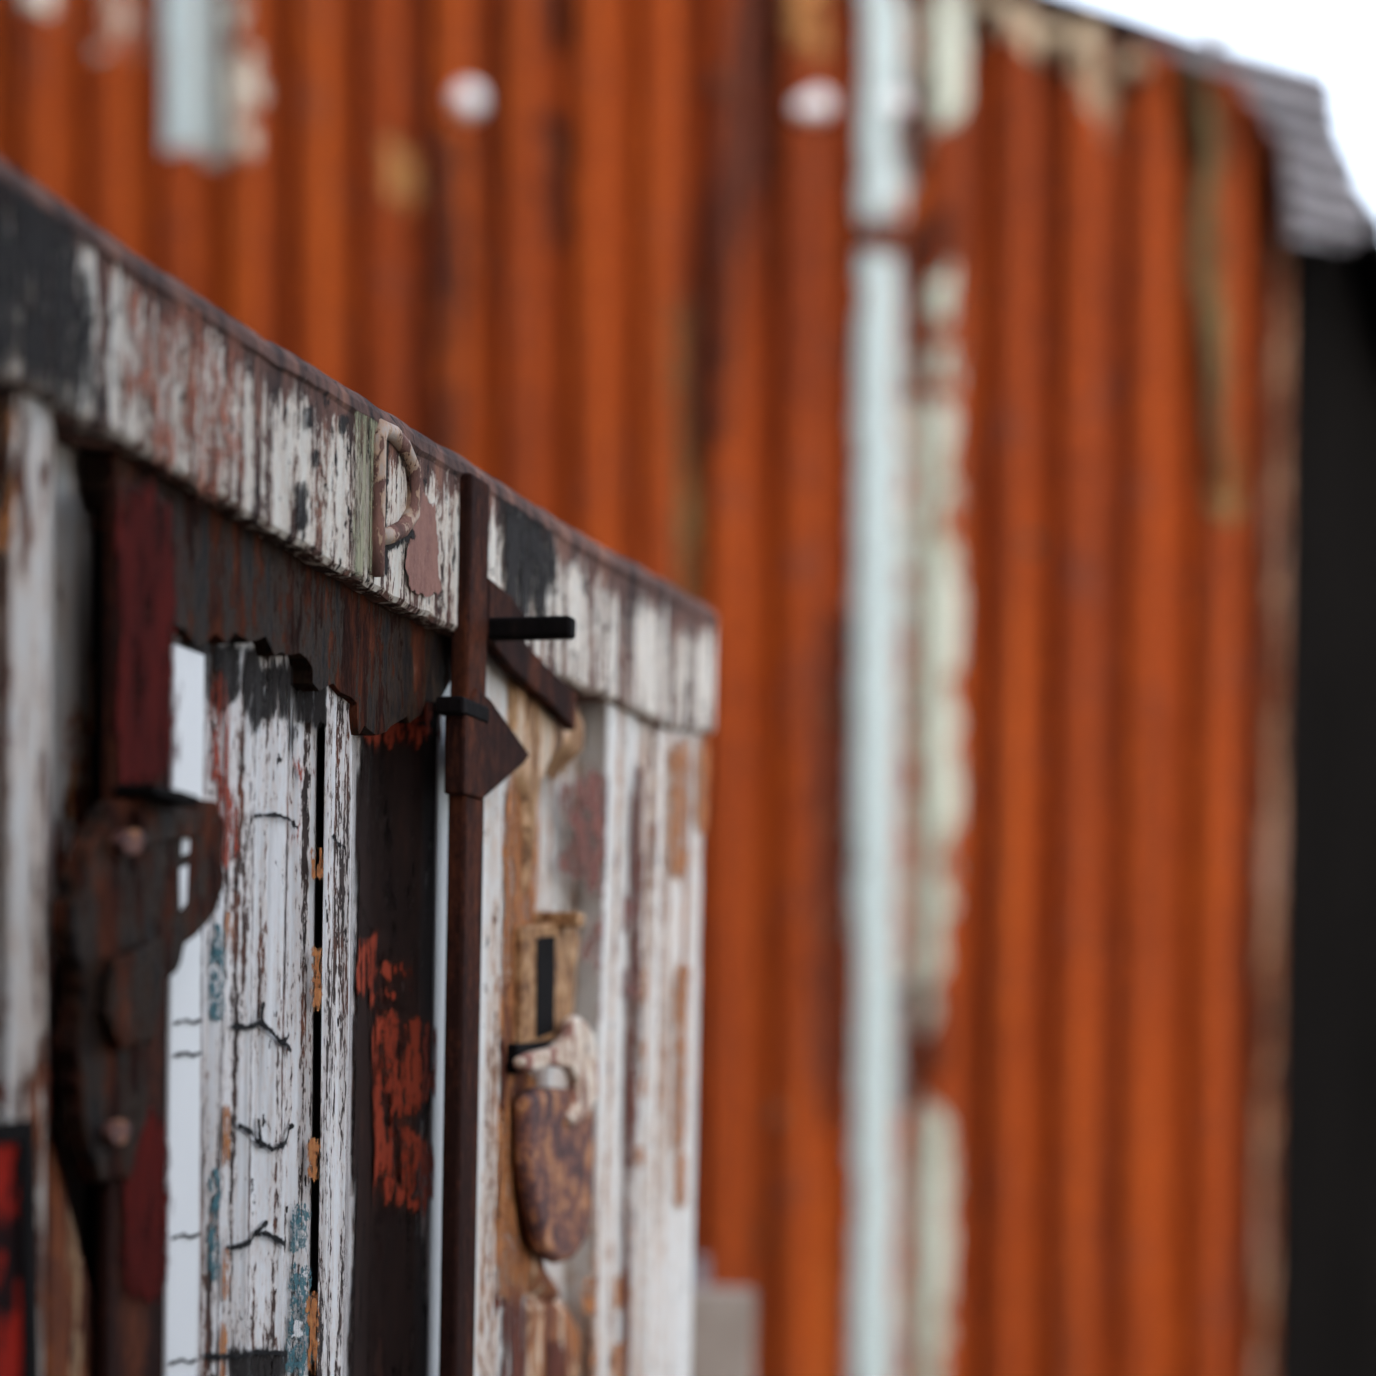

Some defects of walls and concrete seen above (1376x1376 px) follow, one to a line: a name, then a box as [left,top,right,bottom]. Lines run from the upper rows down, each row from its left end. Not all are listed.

peeling [114,480,327,788]
peeling [295,449,320,531]
peeling [405,492,441,598]
corrosion [557,761,608,1020]
peeling [121,1105,173,1305]
crack [172,1220,286,1251]
crack [174,1002,292,1058]
crack [238,1119,294,1152]
corrosion [347,702,441,1376]
corrosion [494,772,540,1376]
corrosion [614,760,647,1376]
crack [170,1348,288,1366]